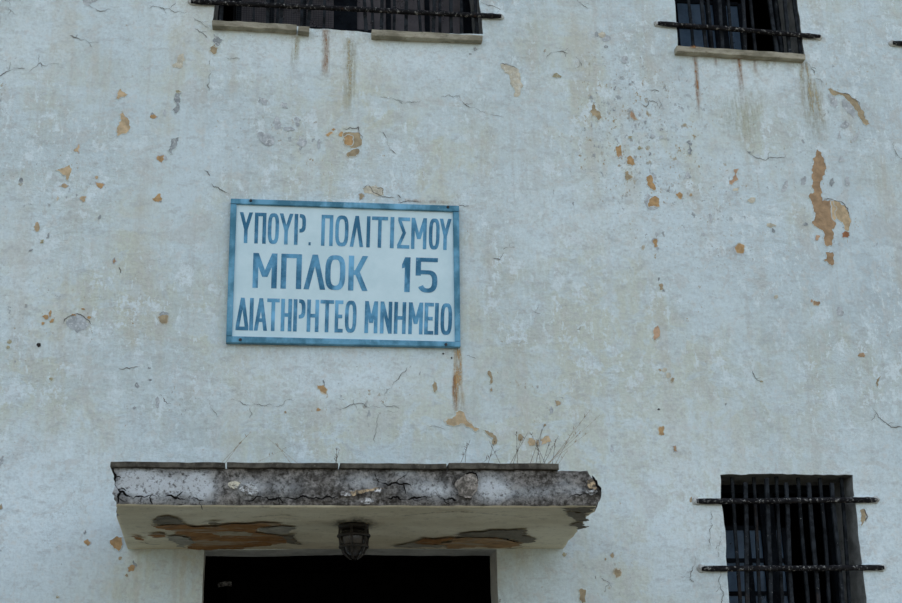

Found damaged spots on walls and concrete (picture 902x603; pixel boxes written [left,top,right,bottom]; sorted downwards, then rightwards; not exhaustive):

peeling [827,87,870,142]
peeling [342,127,363,159]
peeling [614,136,651,180]
peeling [645,174,692,210]
peeling [801,149,852,268]
crack [337,368,407,442]
crack [112,467,203,510]
crack [244,495,338,504]
crack [375,475,457,505]
spalling [562,475,601,530]
peeling [109,516,303,577]
peeling [393,529,536,550]